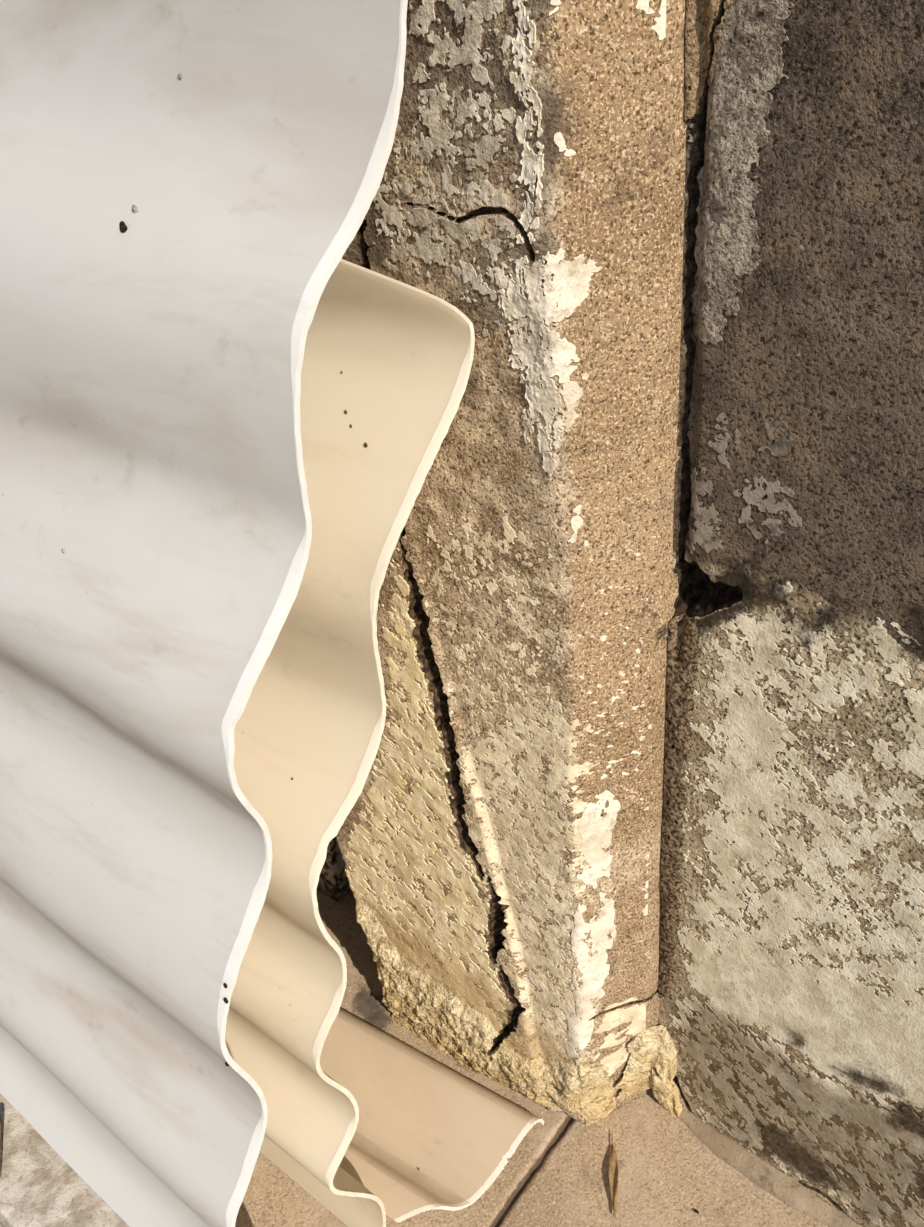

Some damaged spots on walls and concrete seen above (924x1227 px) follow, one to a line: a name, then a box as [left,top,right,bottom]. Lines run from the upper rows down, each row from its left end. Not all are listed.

crack [712,3,725,58]
crack [357,219,371,270]
crack [400,199,535,262]
peeling [373,0,601,480]
crack [673,88,709,573]
peeling [708,413,741,468]
peeling [757,415,794,456]
crack [399,526,526,1051]
peeling [342,467,924,1227]